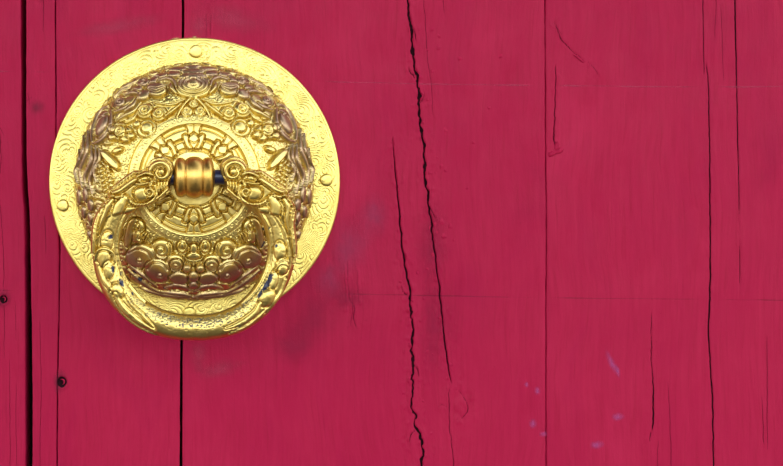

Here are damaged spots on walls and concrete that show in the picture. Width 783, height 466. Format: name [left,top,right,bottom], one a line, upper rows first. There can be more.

crack [393,149,427,466]
crack [407,0,468,466]
crack [649,318,671,466]